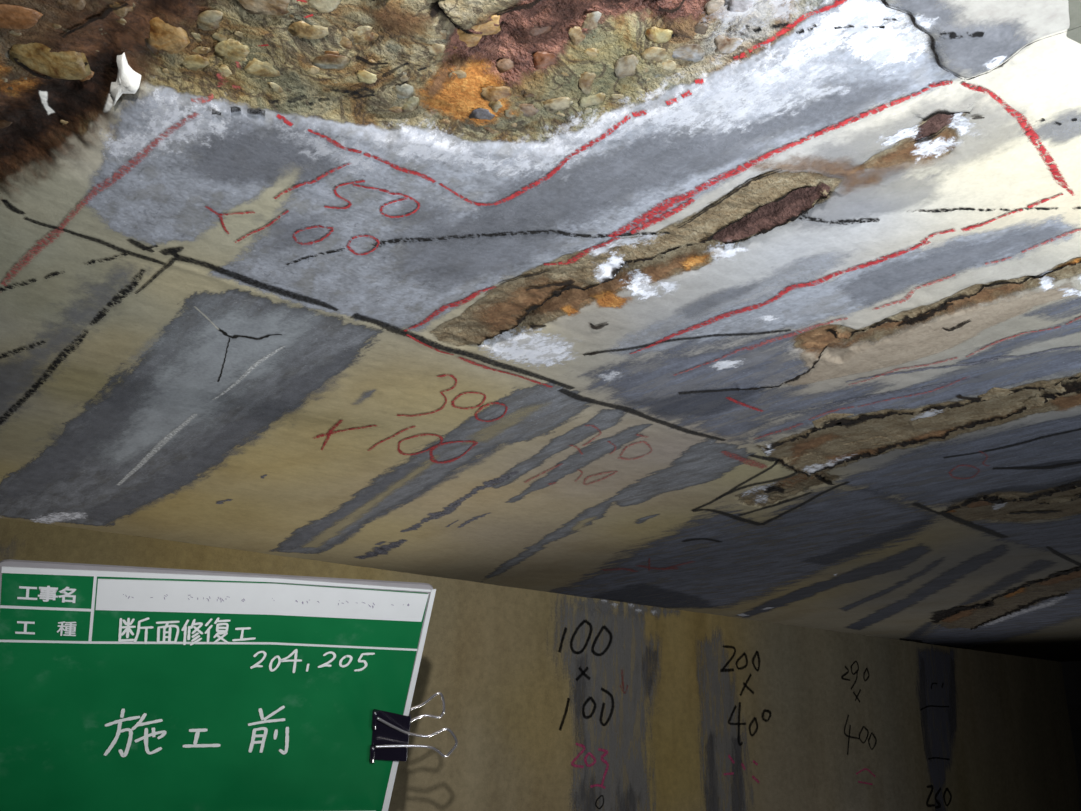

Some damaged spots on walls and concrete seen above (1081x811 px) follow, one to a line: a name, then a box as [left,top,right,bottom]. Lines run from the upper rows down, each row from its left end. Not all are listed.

spalling [0,0,135,139]
spalling [137,0,824,143]
corrosion [418,0,710,125]
spalling [860,111,985,169]
leakage [0,0,959,527]
spalling [430,170,842,364]
spalling [737,257,1081,391]
spalling [735,373,1081,506]
leakage [551,415,1081,811]
spalling [929,566,1081,630]